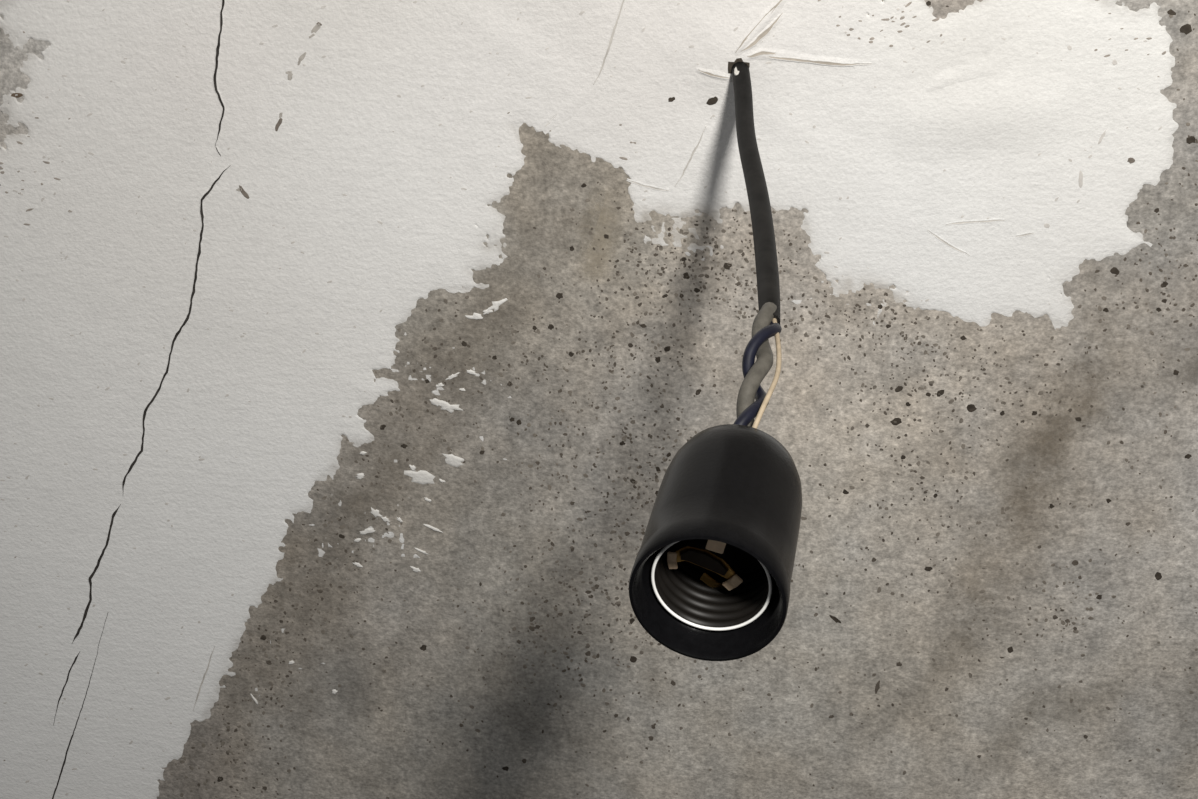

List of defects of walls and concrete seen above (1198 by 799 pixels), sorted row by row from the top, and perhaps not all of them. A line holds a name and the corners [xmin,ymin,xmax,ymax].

flaking render [465,298,508,320]
crack [51,0,231,799]
flaking render [429,369,477,413]
flaking render [442,453,464,467]
flaking render [404,465,445,502]
flaking render [354,507,403,542]